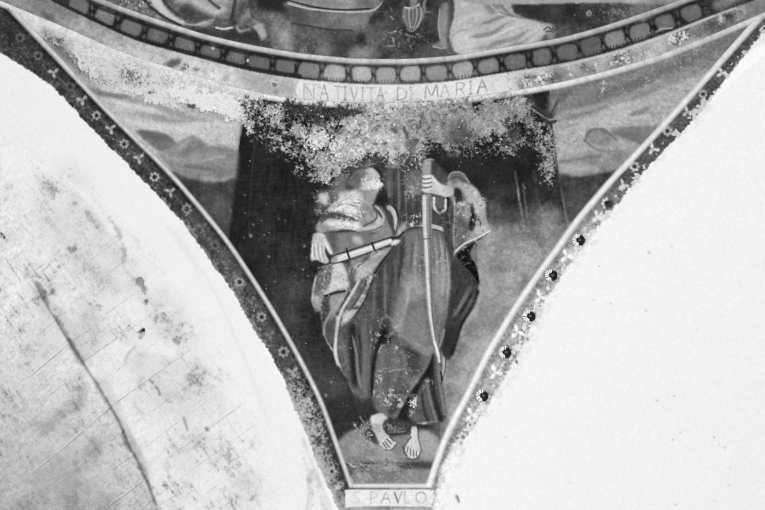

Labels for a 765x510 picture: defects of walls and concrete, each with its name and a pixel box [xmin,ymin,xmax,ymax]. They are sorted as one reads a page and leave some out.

peeling [42,29,558,185]
crack [37,285,156,506]